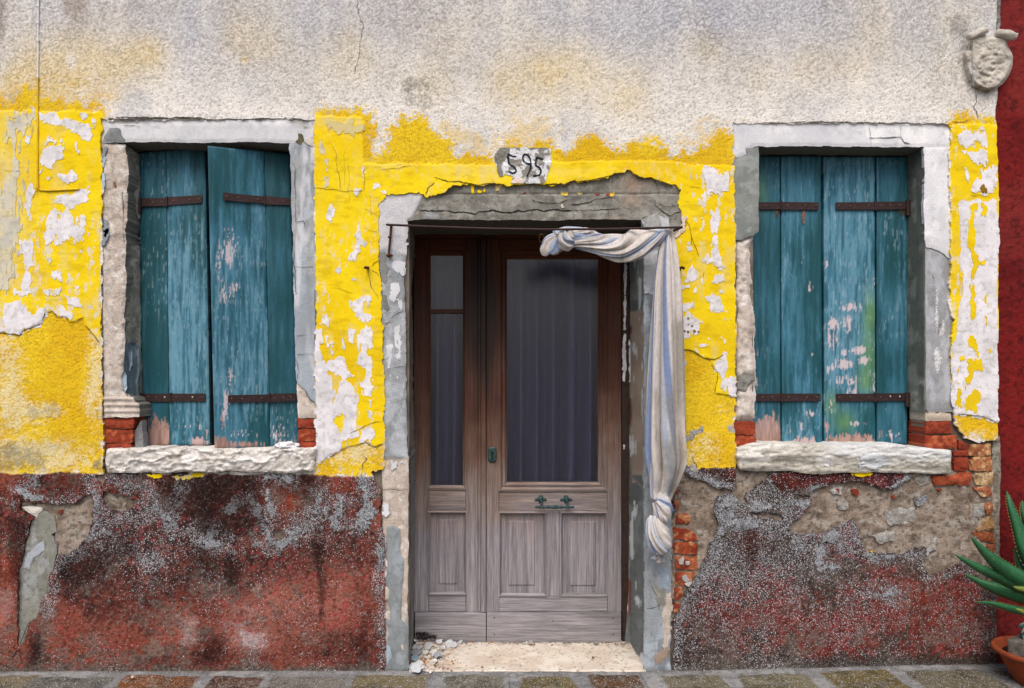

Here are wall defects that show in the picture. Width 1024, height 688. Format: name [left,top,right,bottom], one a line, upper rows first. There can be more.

peeling [0,105,125,336]
flaking render [11,473,138,645]
flaking render [147,473,205,530]
flaking render [295,126,329,189]
peeling [326,204,335,223]
peeling [326,118,365,137]
peeling [335,222,367,281]
peeling [313,251,406,466]
flaking render [686,425,704,442]
peeling [681,165,755,397]
flaking render [652,440,999,664]
peeling [950,126,1000,423]